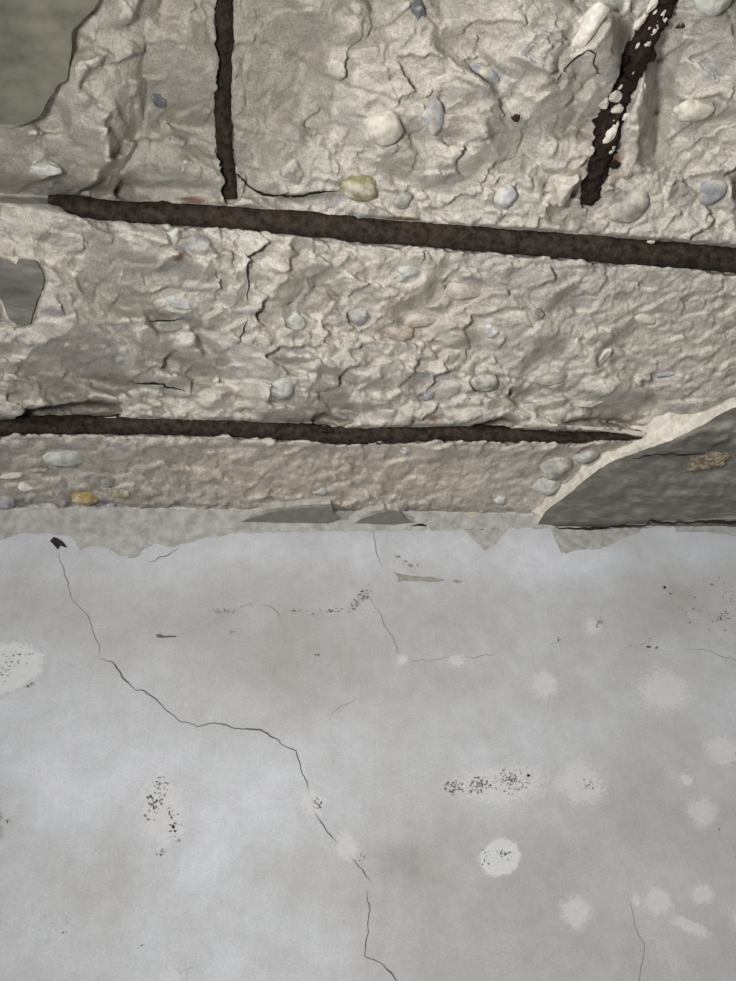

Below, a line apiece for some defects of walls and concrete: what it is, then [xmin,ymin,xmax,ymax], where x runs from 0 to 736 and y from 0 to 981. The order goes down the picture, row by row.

rust [600,155,621,184]
spalling [0,0,736,558]
crack [367,595,502,661]
crack [57,552,309,790]
efflorescence [636,668,693,713]
damp [444,759,605,809]
damp [687,798,720,830]
crack [352,859,397,981]
efflorescence [561,895,591,929]
crack [628,897,645,980]
efflorescence [631,886,707,937]